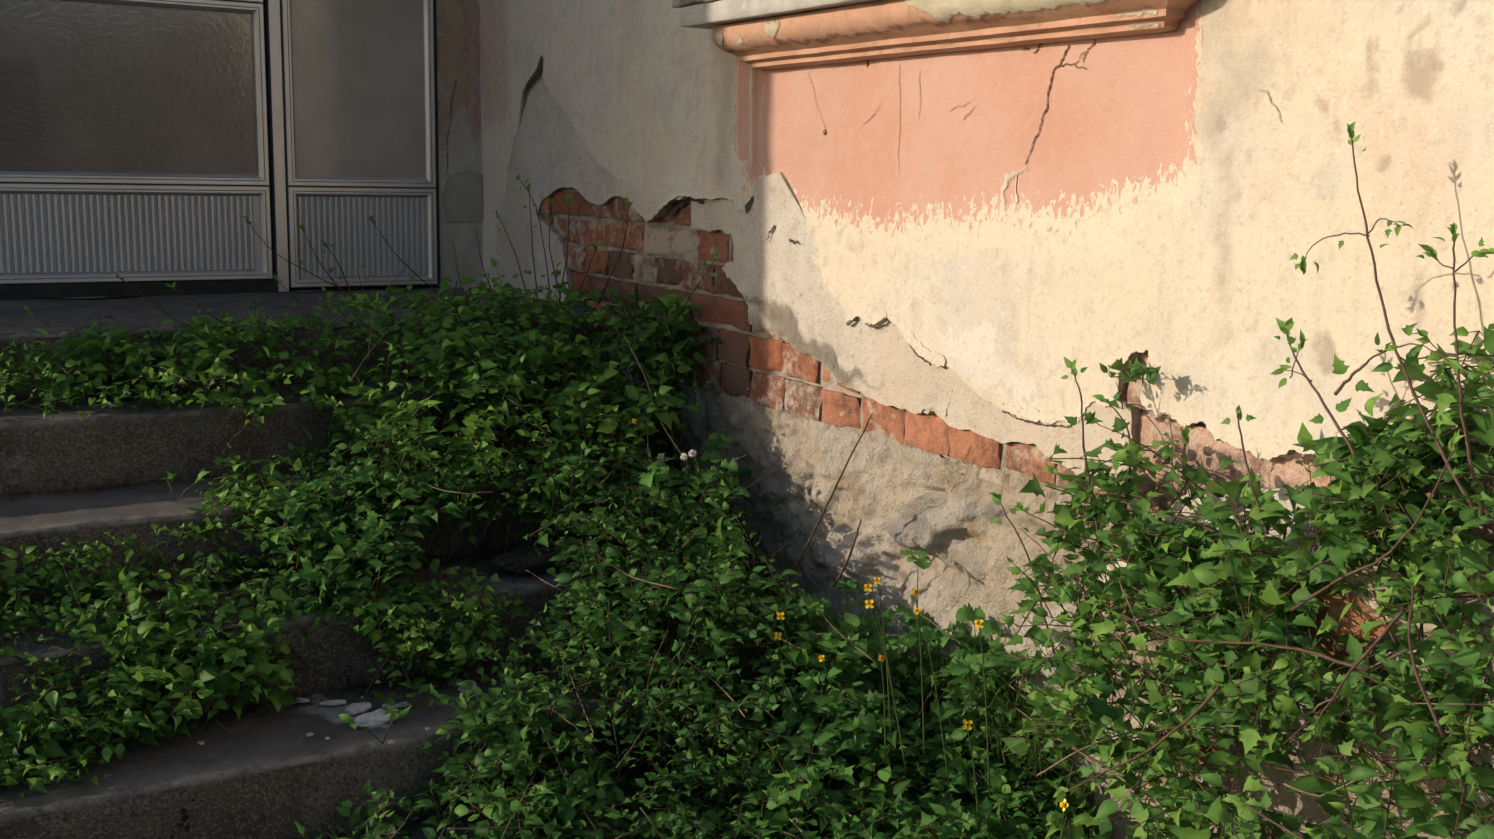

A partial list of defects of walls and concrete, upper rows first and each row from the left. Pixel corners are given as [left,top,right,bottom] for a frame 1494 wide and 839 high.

peeling [904,0,1159,29]
crack [1014,39,1096,203]
flaking render [491,72,1338,553]
spalling [1098,543,1141,583]
flaking render [1437,518,1494,597]